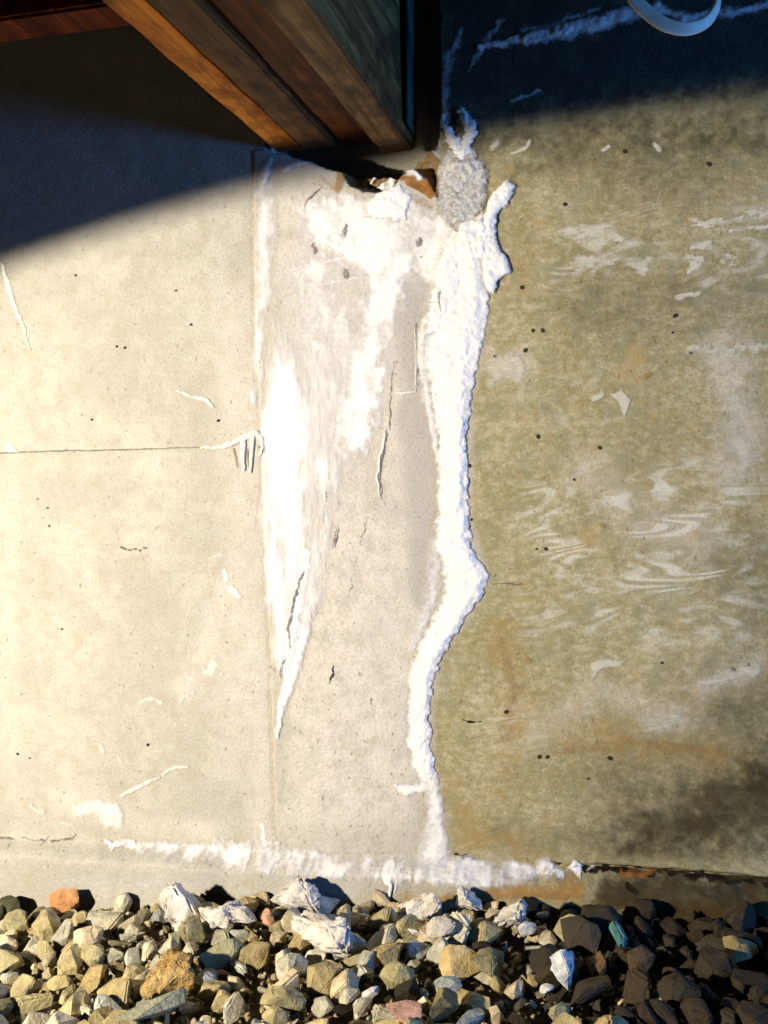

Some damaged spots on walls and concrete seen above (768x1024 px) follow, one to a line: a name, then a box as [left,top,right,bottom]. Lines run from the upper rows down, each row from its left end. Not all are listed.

leakage [440,90,478,160]
spalling [343,147,488,230]
crack [324,324,425,547]
leakage [104,157,593,904]
crack [279,571,304,678]
leakage [641,763,768,842]